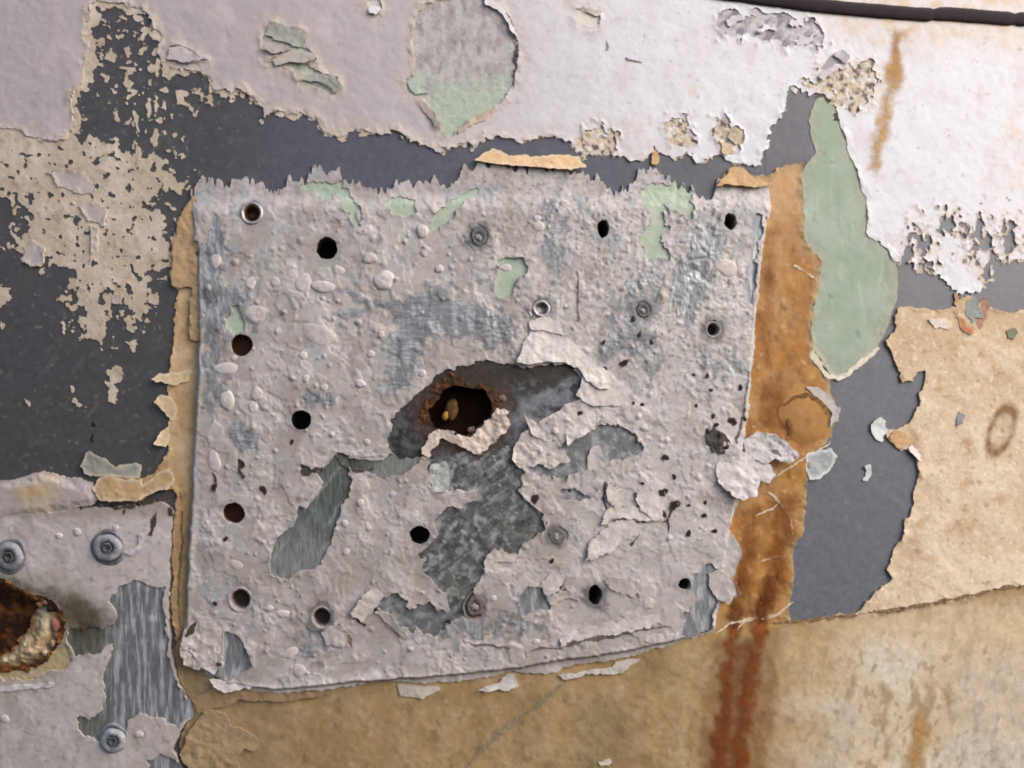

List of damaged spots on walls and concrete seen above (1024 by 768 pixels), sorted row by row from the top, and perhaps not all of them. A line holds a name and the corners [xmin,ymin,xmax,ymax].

peeling [367,0,382,16]
rust [873,36,901,168]
peeling [0,6,1024,620]
rust [0,578,66,673]
peeling [0,580,328,768]
peeling [678,563,737,637]
rust [710,498,794,768]